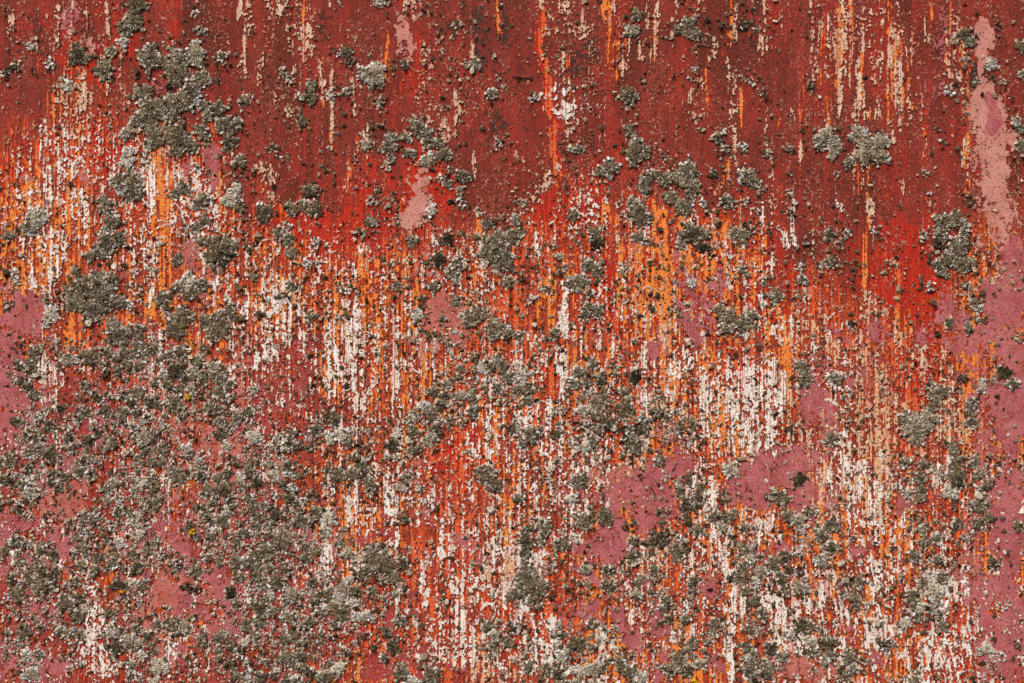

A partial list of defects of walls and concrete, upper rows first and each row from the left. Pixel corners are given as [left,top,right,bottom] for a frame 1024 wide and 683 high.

peeling [424,78,476,146]
peeling [780,98,820,166]
peeling [819,143,888,249]